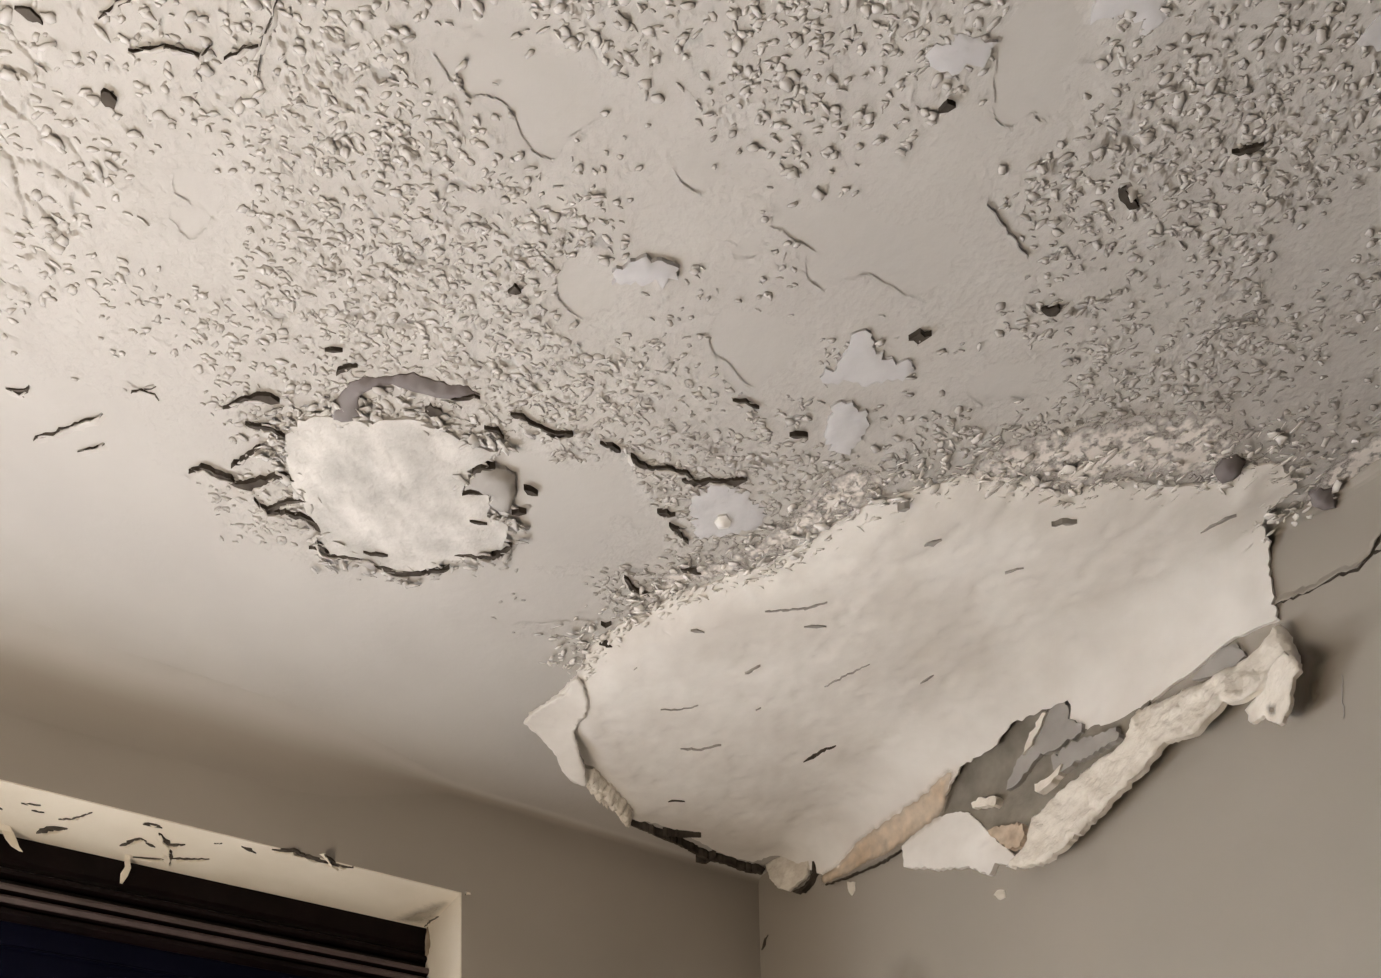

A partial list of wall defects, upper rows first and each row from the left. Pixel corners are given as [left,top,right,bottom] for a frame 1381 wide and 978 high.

crack [98,0,132,20]
crack [128,0,278,76]
crack [6,385,35,399]
crack [131,385,159,401]
crack [33,412,109,457]
peeling [1089,461,1179,485]
crack [1273,524,1381,606]
spalling [1006,624,1303,870]
spalling [932,700,1152,855]
peeling [0,823,23,852]
peeling [120,854,131,884]
spalling [765,856,810,892]